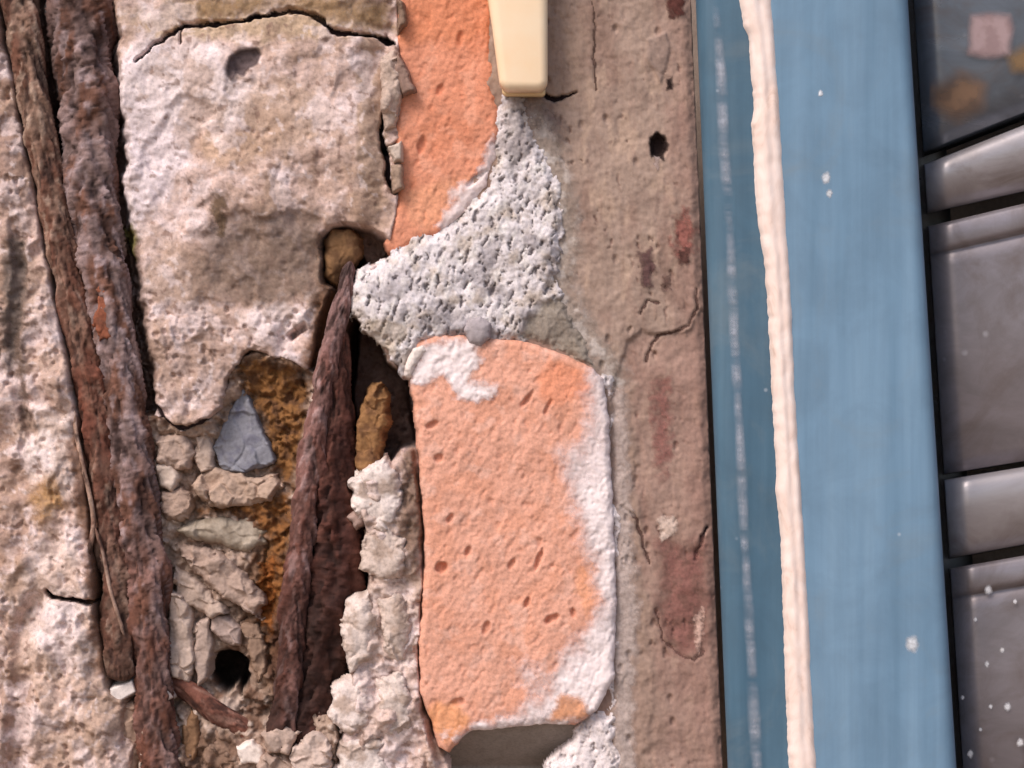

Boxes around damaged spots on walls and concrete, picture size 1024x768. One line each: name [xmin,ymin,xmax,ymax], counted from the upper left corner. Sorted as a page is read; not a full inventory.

crack [136,9,396,62]
spalling [380,49,417,131]
crack [379,116,391,189]
spalling [387,141,405,195]
spalling [0,0,368,768]
efflorescence [411,339,497,402]
rust [197,231,337,640]
rust [32,479,60,519]
crack [47,589,96,604]
rust [70,417,106,674]
water stain [400,449,424,571]
water stain [443,372,639,768]